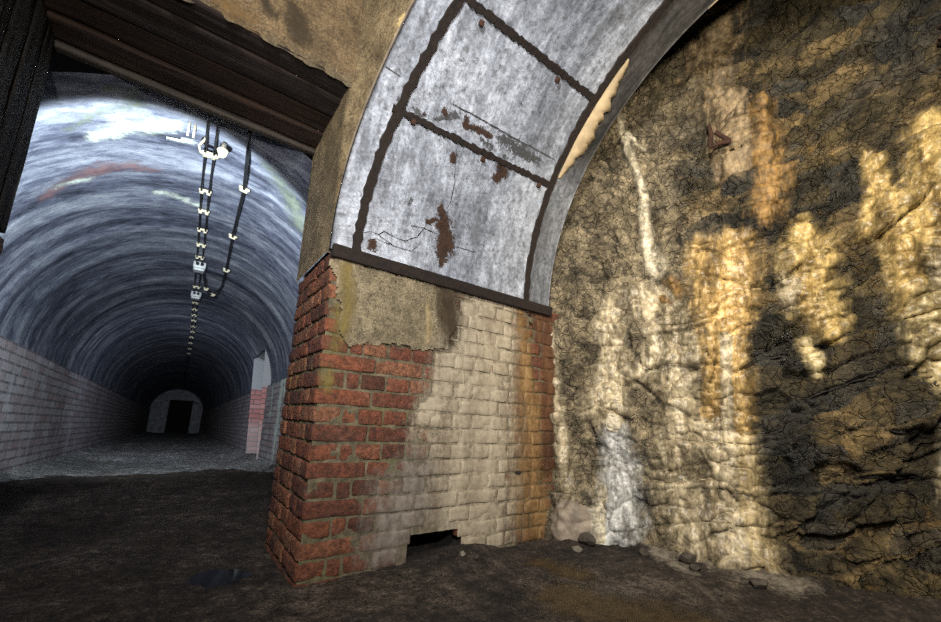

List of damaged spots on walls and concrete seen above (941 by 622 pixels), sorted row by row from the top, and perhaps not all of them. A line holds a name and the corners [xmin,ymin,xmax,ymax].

corrosion [460,114,493,139]
corrosion [492,162,509,184]
corrosion [425,203,457,267]
peeling [328,258,452,352]
crack [735,322,941,401]
water stain [363,287,527,567]
corrosion [517,309,555,541]
crack [884,426,920,434]
crack [856,473,914,481]